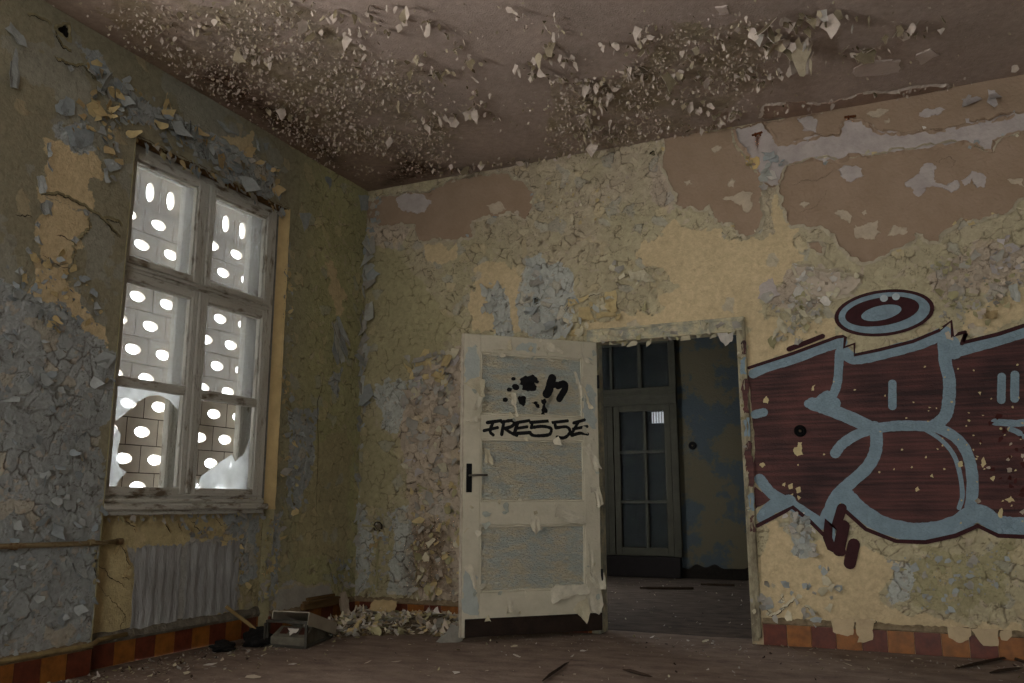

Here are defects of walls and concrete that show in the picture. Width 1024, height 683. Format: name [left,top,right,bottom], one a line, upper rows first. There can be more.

peeling [6,142,103,353]
spalling [54,22,72,43]
crack [17,191,123,269]
peeling [55,56,286,218]
peeling [153,2,234,64]
peeling [223,48,317,71]
peeling [354,198,382,452]
peeling [253,0,501,149]
flaking render [411,9,1024,349]
peeling [0,325,260,656]
peeling [750,483,875,643]
peeling [887,542,1020,646]